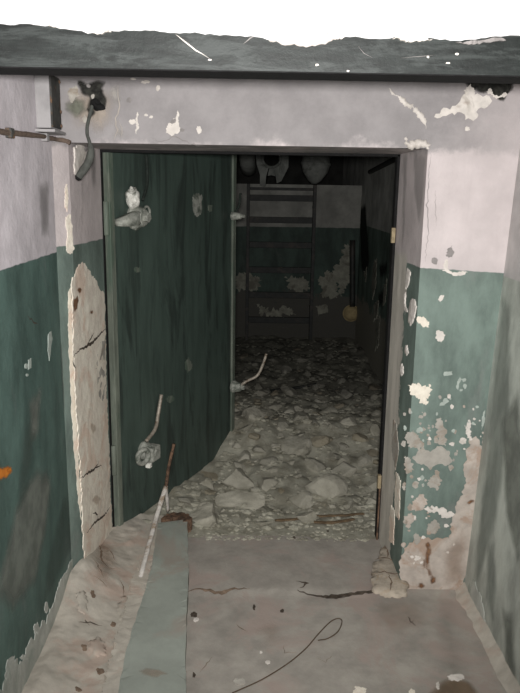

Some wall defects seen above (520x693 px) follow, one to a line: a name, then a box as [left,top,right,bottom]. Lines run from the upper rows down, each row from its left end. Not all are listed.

spalling [166,111,184,136]
flaking render [389,84,507,131]
spalling [64,184,75,254]
peeling [284,243,350,314]
peeling [257,304,296,317]
crack [73,329,105,368]
peeling [68,262,113,558]
peeling [371,383,485,621]
rust [419,543,435,588]
crack [188,587,246,595]
crack [298,581,373,599]